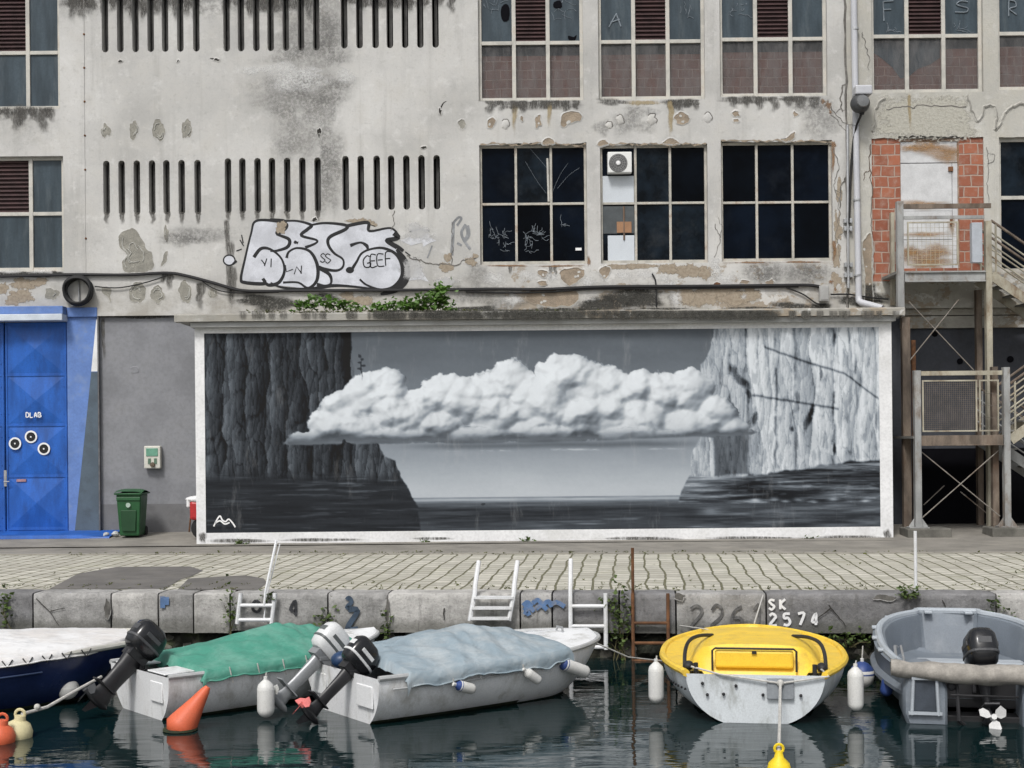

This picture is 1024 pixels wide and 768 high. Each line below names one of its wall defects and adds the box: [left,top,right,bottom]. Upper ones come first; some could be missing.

leakage [0,107,53,128]
spalling [480,109,706,148]
leakage [729,97,819,108]
crack [831,0,873,307]
crack [407,221,476,266]
flaking render [0,269,49,306]
flaking render [506,259,775,309]